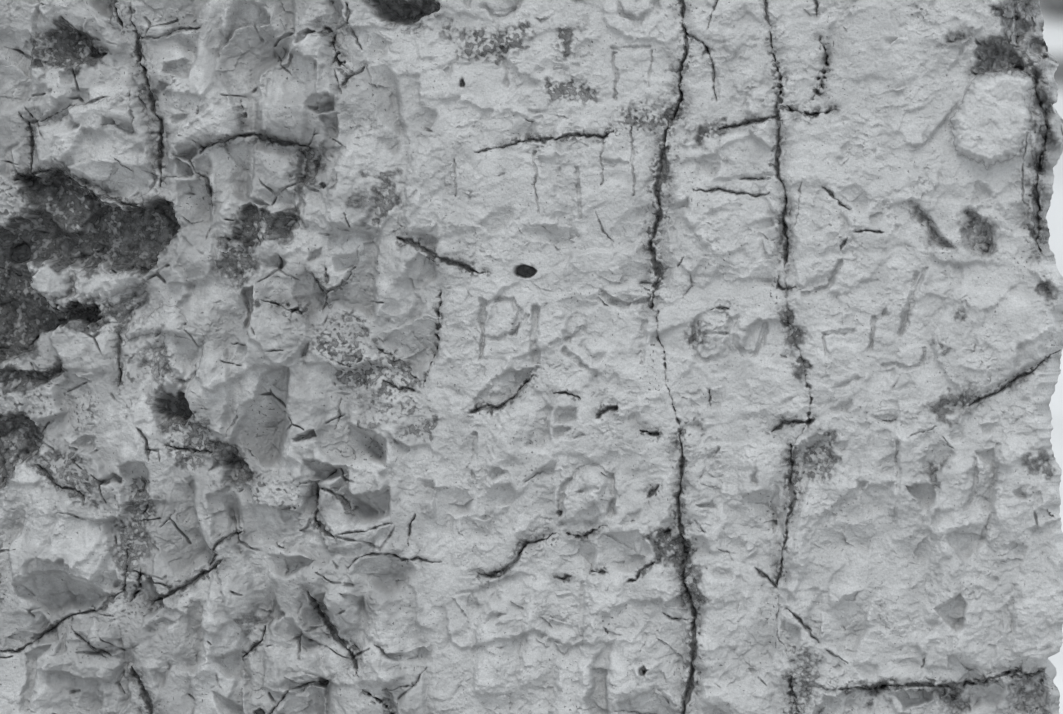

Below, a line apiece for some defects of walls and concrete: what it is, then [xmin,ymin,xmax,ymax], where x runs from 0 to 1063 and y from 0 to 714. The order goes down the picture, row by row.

crack [19,0,314,209]
crack [483,129,616,151]
crack [705,0,839,291]
crack [969,16,1051,259]
crack [758,385,816,586]
crack [787,675,797,705]
crack [840,666,1035,692]